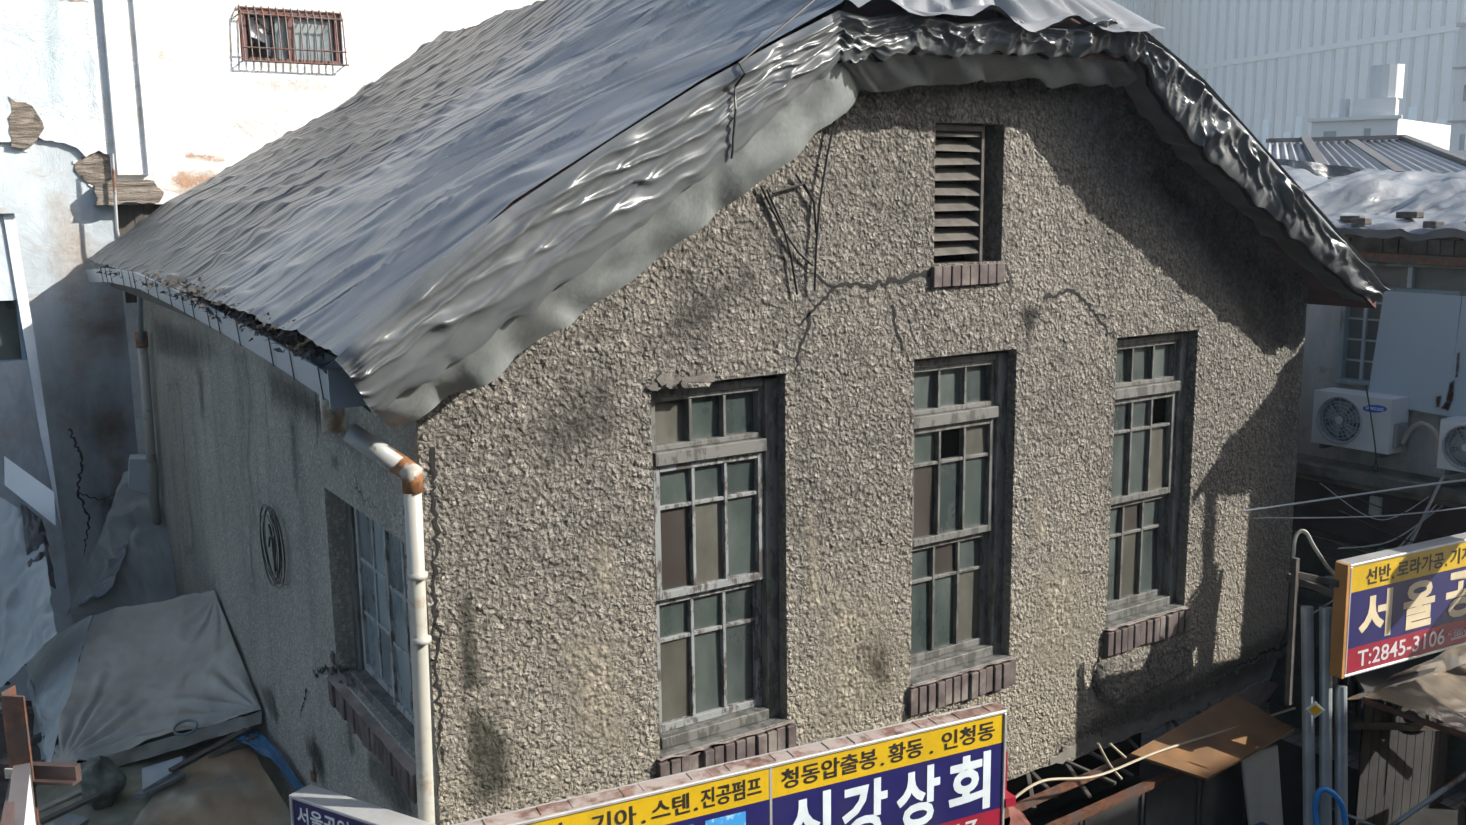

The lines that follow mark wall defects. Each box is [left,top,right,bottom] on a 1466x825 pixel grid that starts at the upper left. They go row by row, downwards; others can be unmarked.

flaking render [8,96,44,152]
flaking render [73,144,112,187]
crack [768,233,931,374]
crack [1006,264,1117,349]
crack [68,428,113,554]
water stain [309,742,323,776]